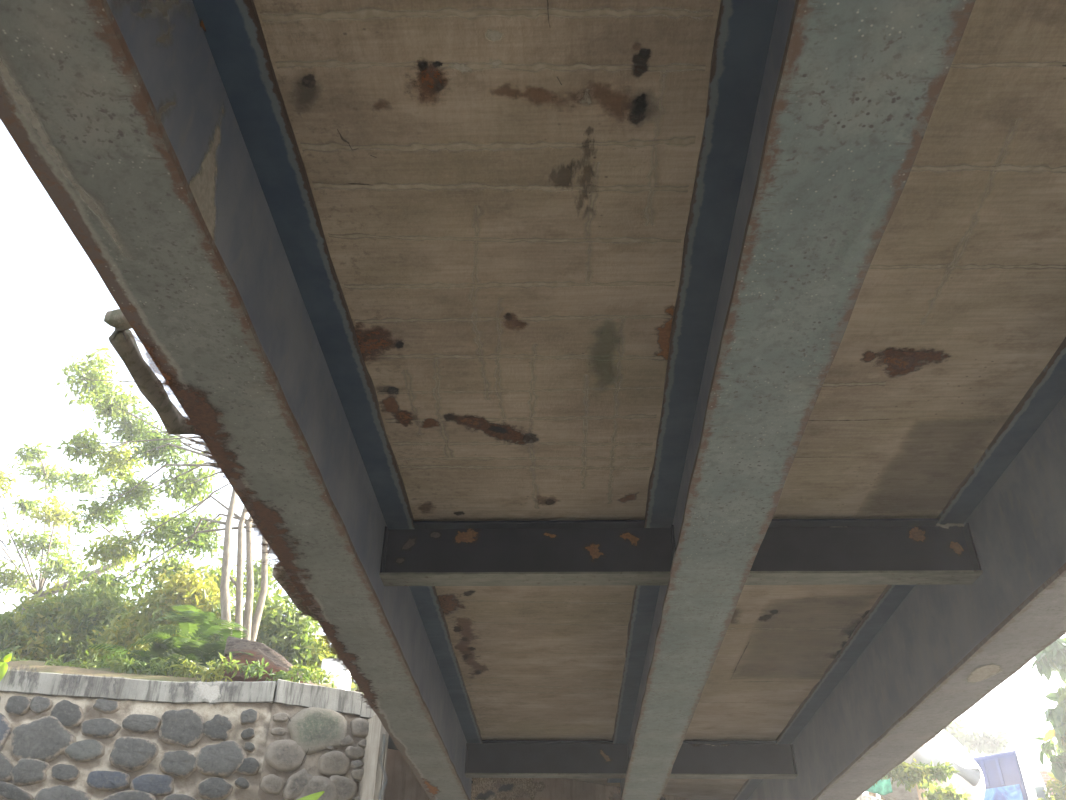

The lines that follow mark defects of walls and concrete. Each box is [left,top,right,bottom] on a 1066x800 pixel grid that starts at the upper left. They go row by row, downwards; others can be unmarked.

corrosion [414,61,446,102]
corrosion [492,83,631,121]
corrosion [355,322,404,361]
corrosion [130,334,378,708]
corrosion [437,591,475,615]